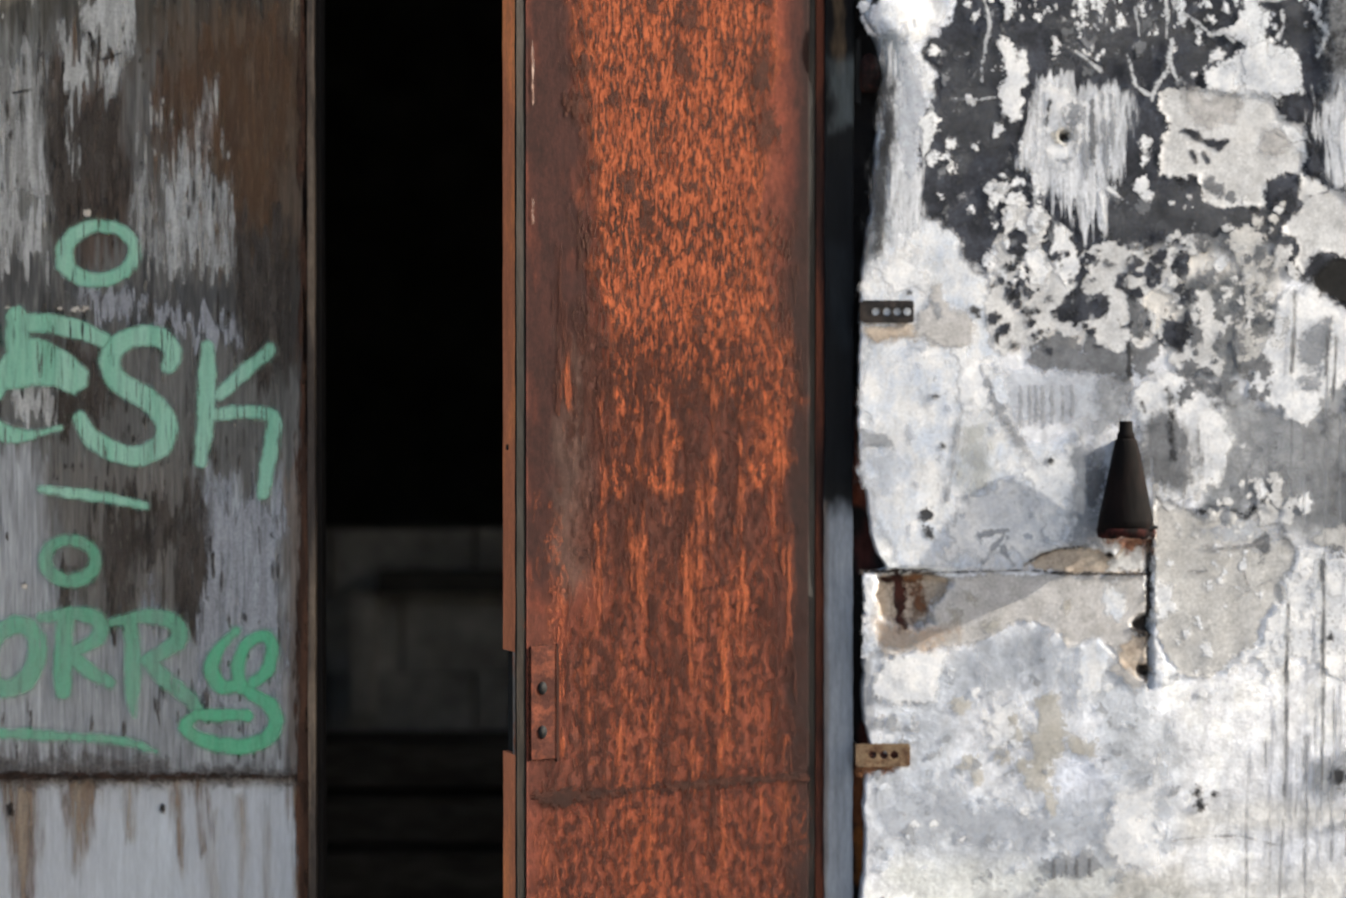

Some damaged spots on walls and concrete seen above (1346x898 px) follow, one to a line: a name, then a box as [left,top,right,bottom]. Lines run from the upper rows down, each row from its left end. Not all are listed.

peeling [0,0,291,446]
rust [537,0,810,898]
peeling [859,0,1346,845]
water stain [1253,419,1341,535]
water stain [1324,336,1337,401]
rust [879,624,950,651]
crack [859,539,1154,690]
water stain [1270,553,1346,898]
peeling [1101,754,1168,874]